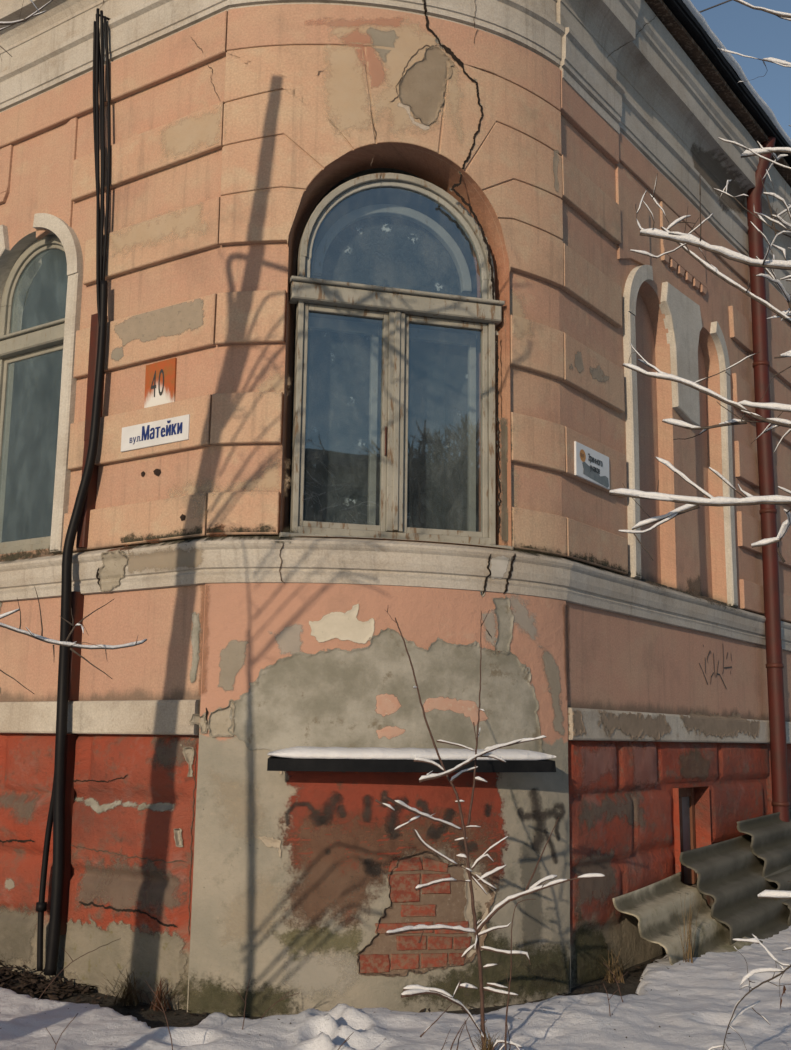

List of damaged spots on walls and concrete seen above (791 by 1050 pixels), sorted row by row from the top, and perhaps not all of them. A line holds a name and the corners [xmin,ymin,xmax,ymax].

peeling [309,18,454,132]
crack [370,0,495,300]
peeling [114,298,204,346]
crack [480,331,516,597]
peeling [98,549,202,592]
peeling [309,604,375,644]
peeling [375,693,405,739]
peeling [423,697,488,726]
peeling [542,651,587,736]
peeling [599,710,760,743]
spalling [356,850,495,977]